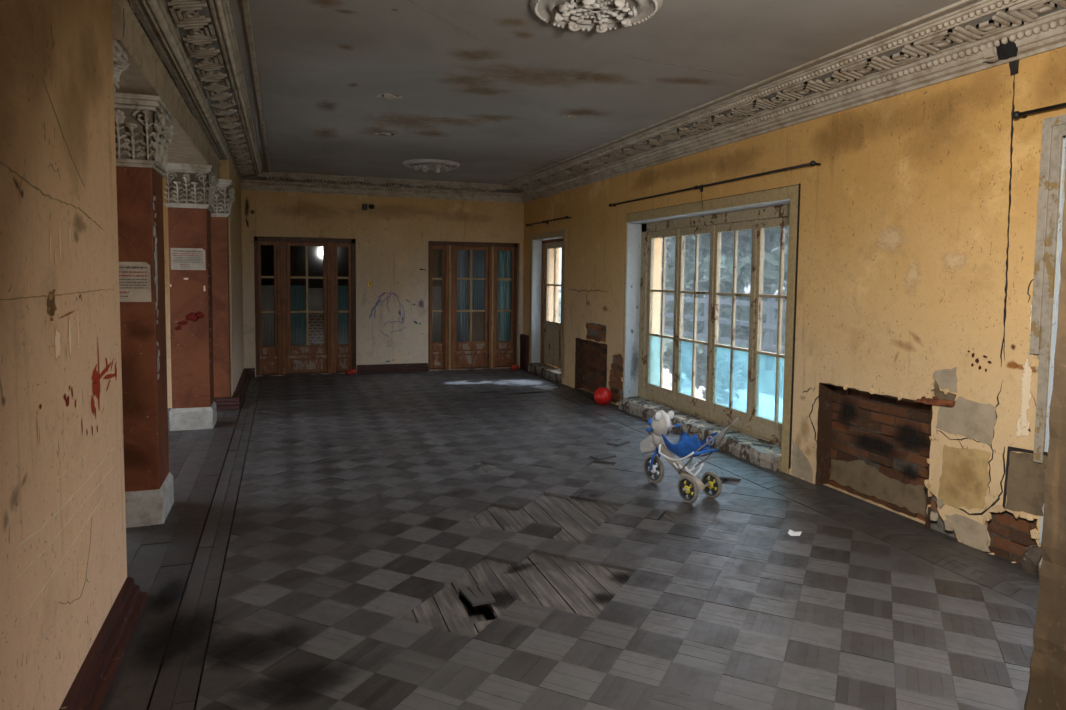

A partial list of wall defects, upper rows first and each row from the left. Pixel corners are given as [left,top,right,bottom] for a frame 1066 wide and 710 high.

flaking render [814,380,957,538]
flaking render [984,505,1039,564]